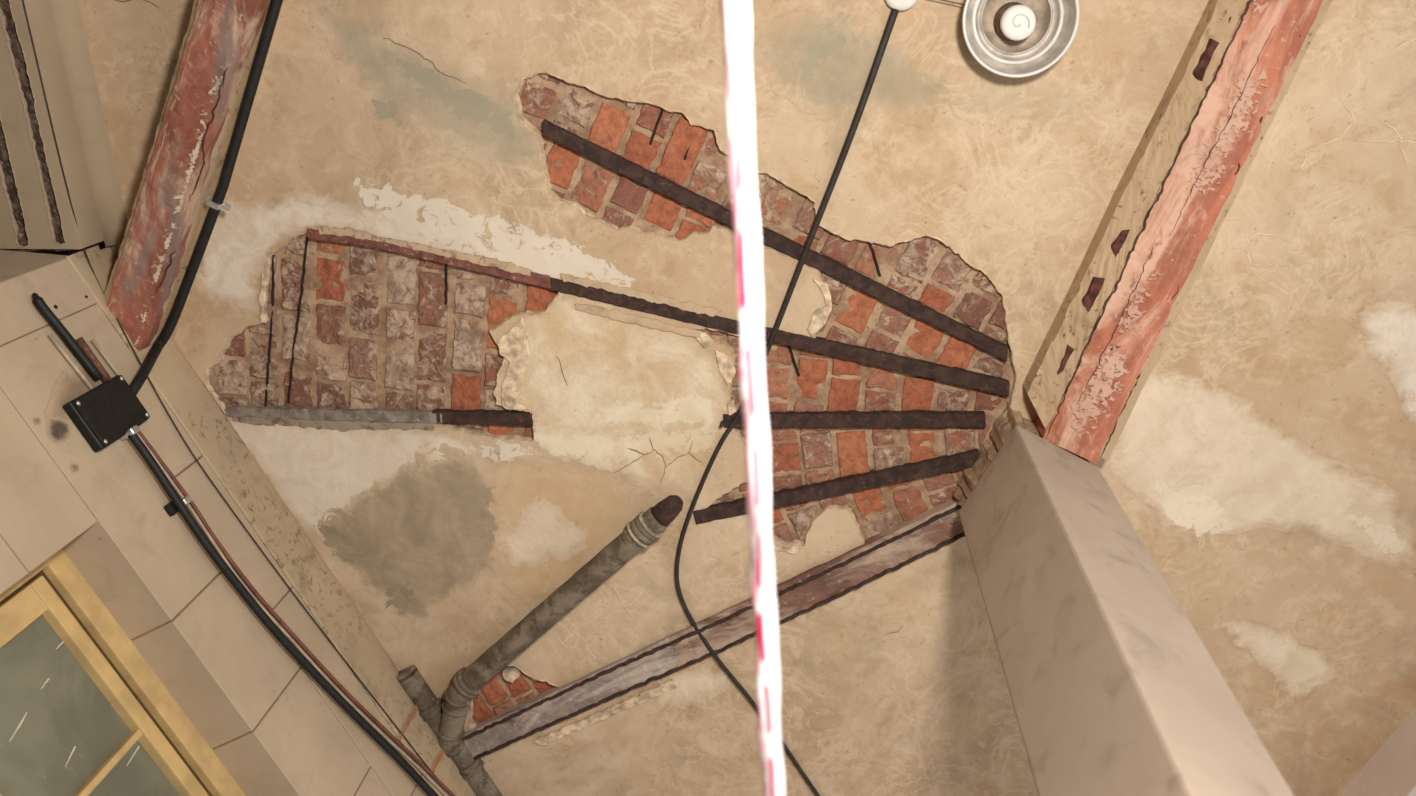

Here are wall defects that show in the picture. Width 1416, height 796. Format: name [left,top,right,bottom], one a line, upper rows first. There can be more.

spalling [0,0,72,252]
flaking render [514,72,734,242]
flaking render [190,175,748,540]
flaking render [755,172,1017,554]
leakage [314,441,636,625]
rust [775,505,965,625]
flaking render [469,665,558,729]
rust [462,605,755,760]